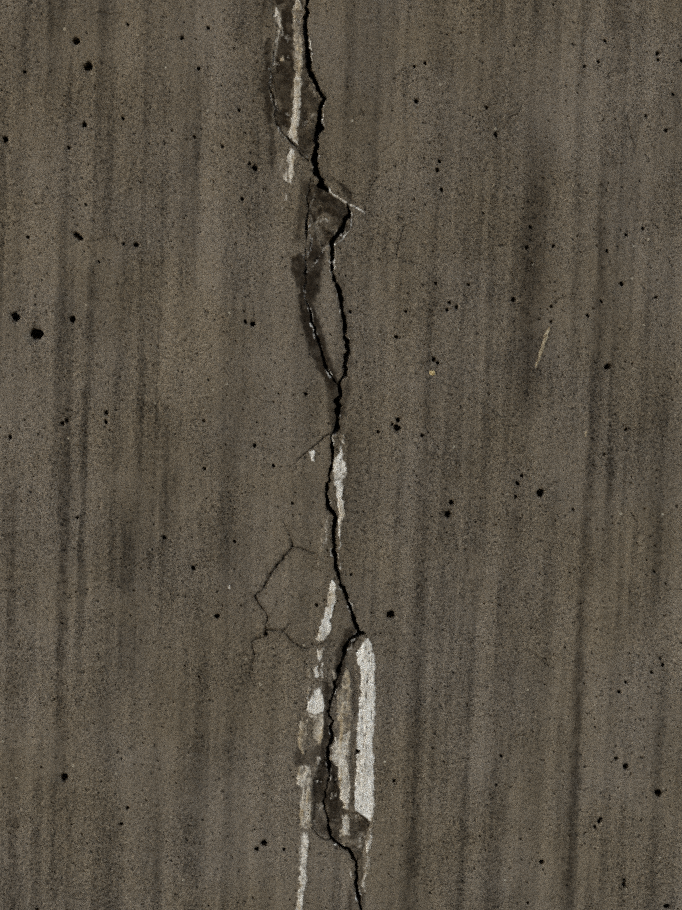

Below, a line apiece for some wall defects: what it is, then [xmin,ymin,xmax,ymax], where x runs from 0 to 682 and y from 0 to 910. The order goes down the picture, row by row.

spalling [269,0,322,158]
damp [258,0,356,571]
crack [249,0,386,910]
damp [293,581,378,910]
spalling [316,639,370,853]